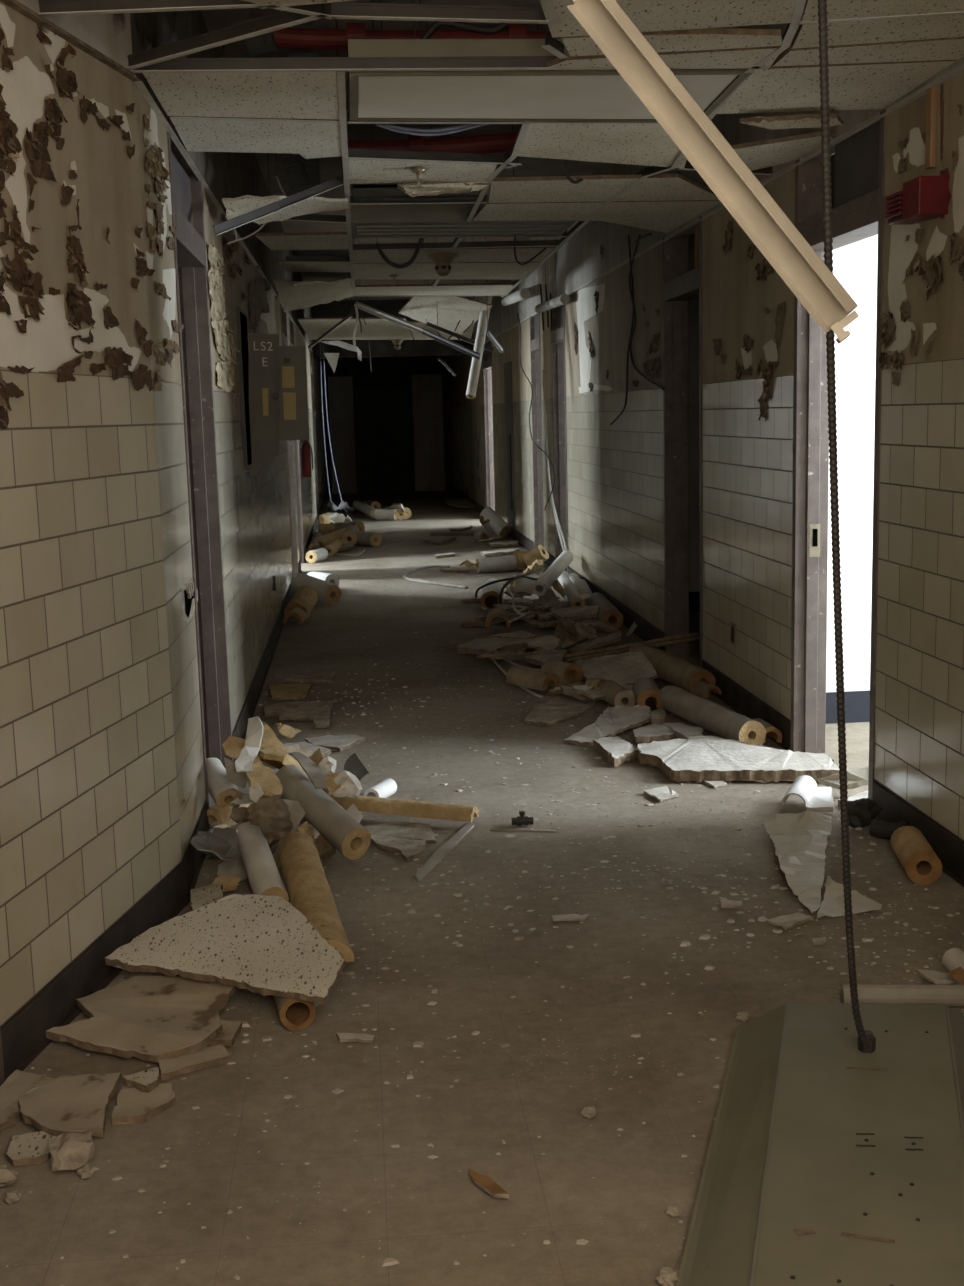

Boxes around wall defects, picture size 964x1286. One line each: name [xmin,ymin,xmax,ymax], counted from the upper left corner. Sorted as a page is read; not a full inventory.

peeling [892,127,926,174]
peeling [0,4,184,429]
peeling [723,221,774,283]
peeling [877,135,964,386]
peeling [713,302,785,421]